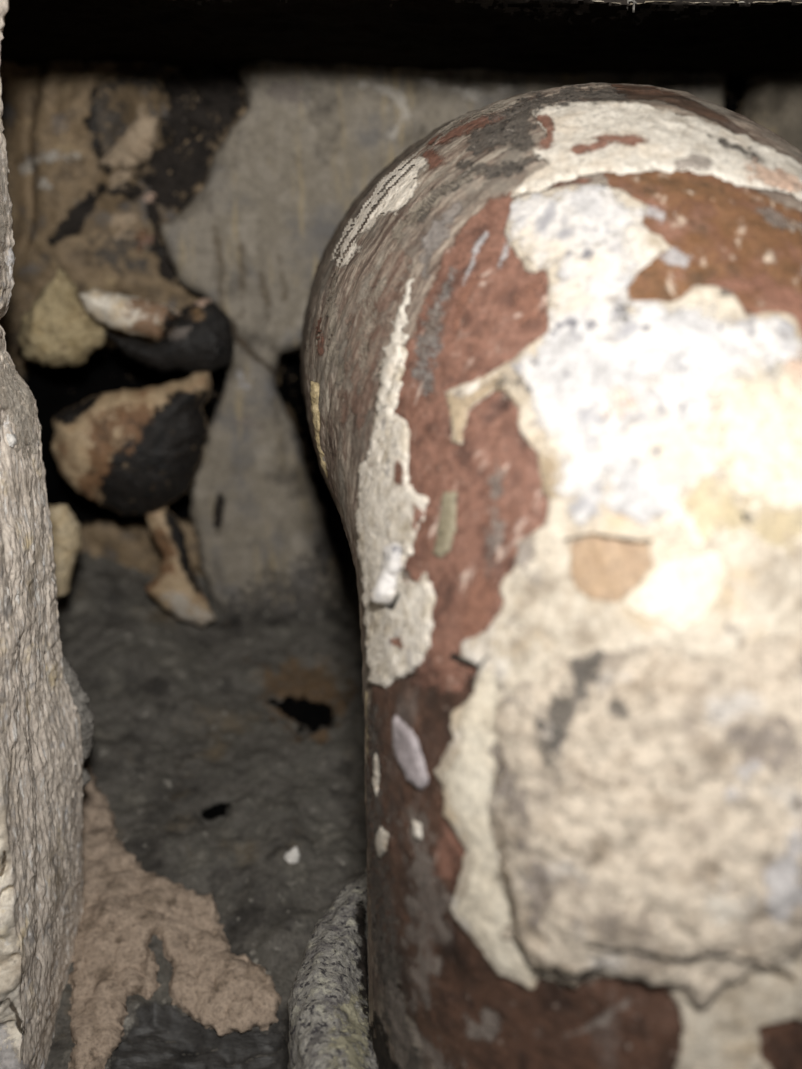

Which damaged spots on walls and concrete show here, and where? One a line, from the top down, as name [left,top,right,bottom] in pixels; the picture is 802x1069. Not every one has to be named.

rust [422,115,503,169]
rust [611,84,758,142]
rust [551,169,802,332]
rust [338,248,412,434]
peeling [325,97,802,991]
rust [364,191,683,1069]
crack [0,851,8,877]
crack [0,997,27,1034]
peeling [653,949,802,1069]
rust [759,1018,802,1069]